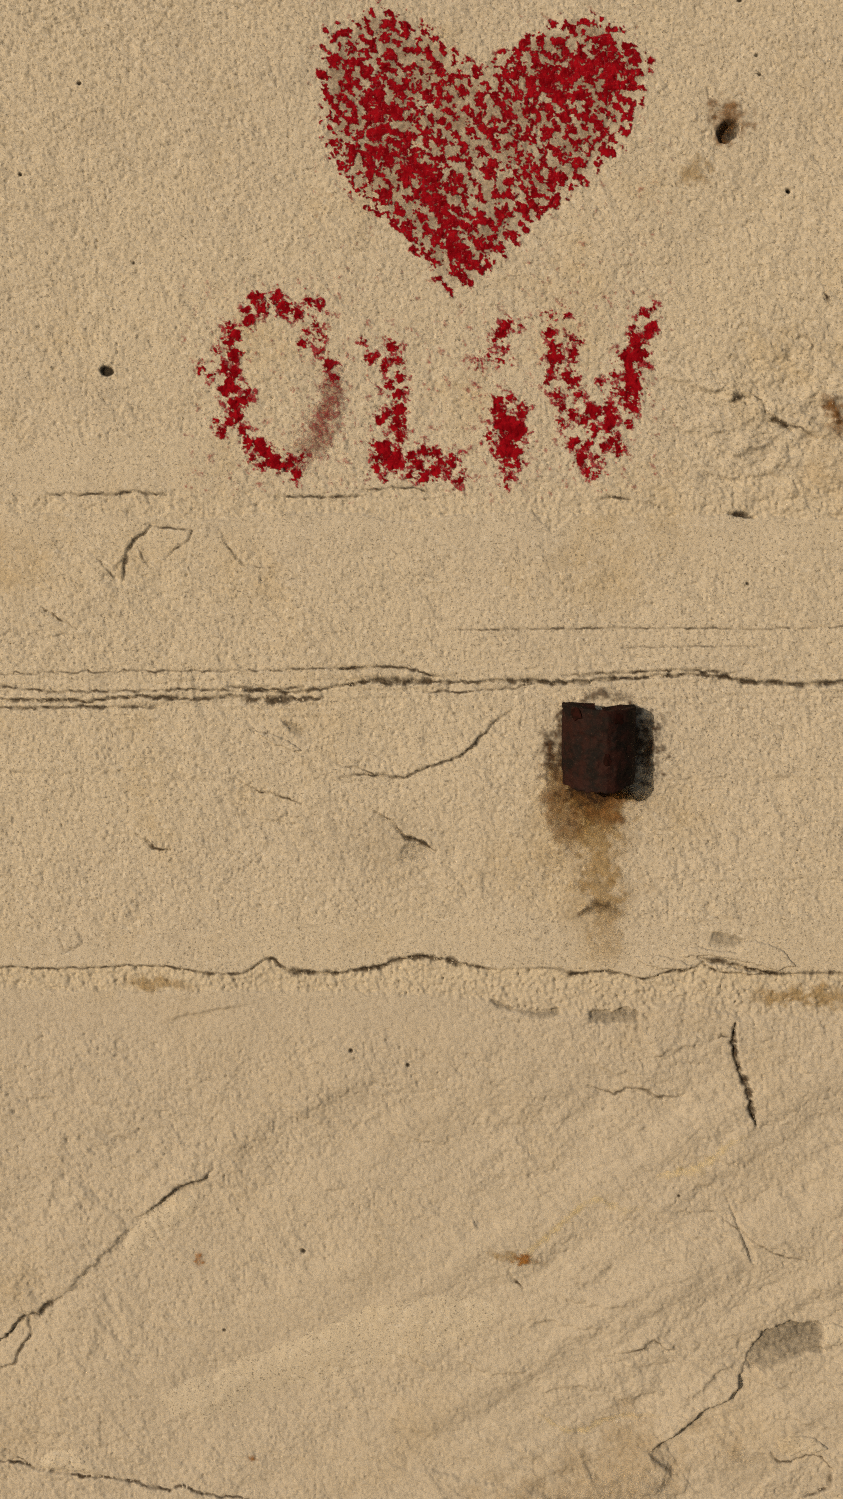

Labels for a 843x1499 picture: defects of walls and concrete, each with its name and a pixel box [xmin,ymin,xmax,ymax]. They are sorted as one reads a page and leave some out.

crack [58,491,192,576]
crack [731,511,751,519]
crack [2,666,837,734]
crack [357,729,489,778]
corrosion [543,688,670,895]
crack [8,954,485,975]
crack [568,959,783,980]
crack [719,1029,755,1119]
crack [7,1301,53,1355]